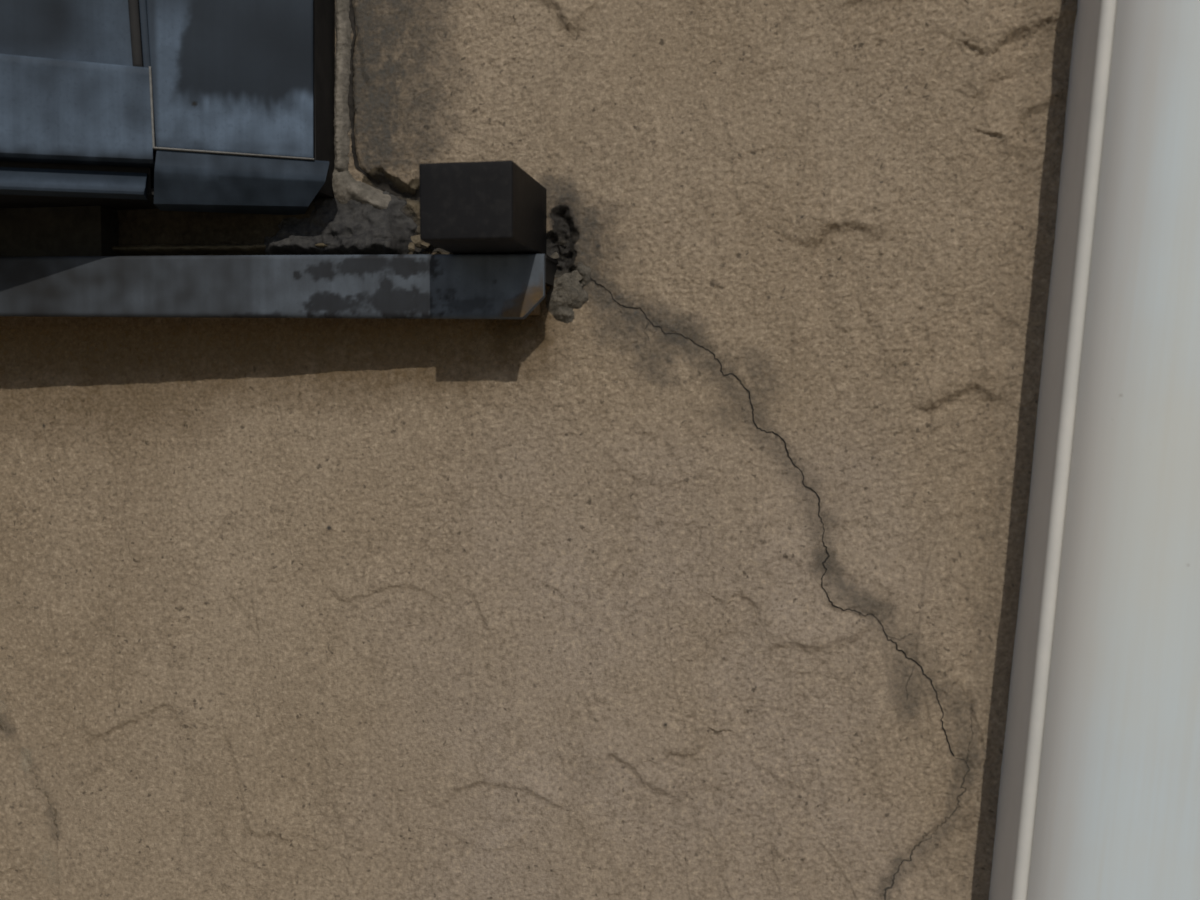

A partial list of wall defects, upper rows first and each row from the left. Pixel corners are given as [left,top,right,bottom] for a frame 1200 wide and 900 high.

spalling [362,167,453,254]
spalling [546,205,591,323]
crack [565,270,970,796]
crack [884,852,913,900]